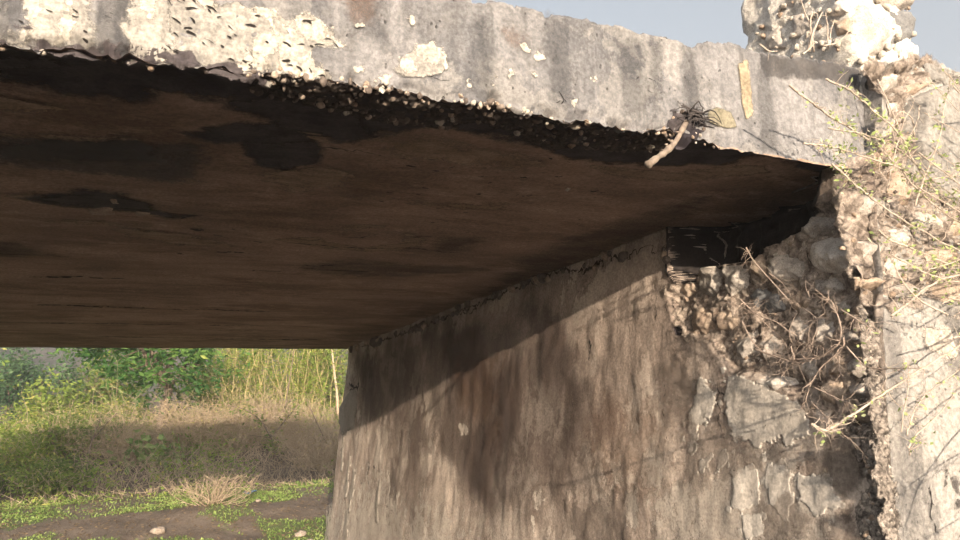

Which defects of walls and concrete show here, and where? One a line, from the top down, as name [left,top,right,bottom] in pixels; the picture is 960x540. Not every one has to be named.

spalling [0,0,736,162]
leakage [0,45,831,183]
leakage [16,188,193,219]
spalling [610,52,960,540]
leakage [944,469,960,509]